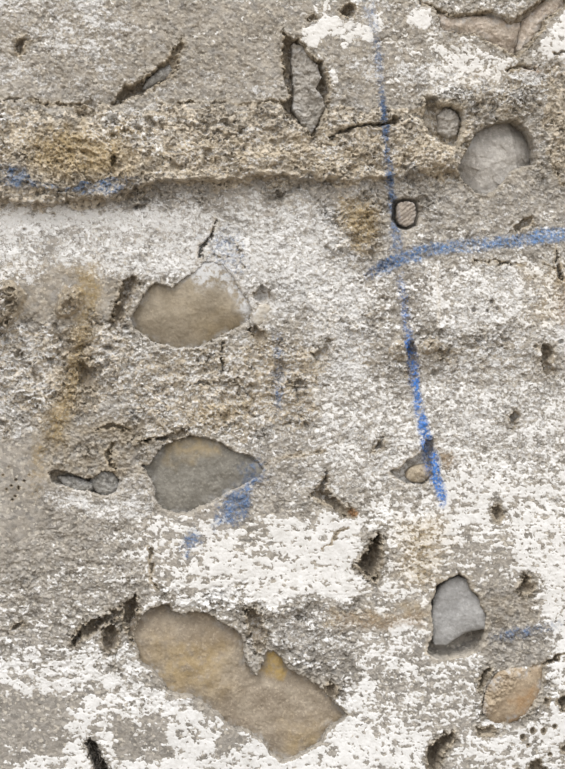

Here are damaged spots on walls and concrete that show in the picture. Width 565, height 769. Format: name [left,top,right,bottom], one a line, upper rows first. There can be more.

crack [417,0,436,10]
crack [196,217,246,269]